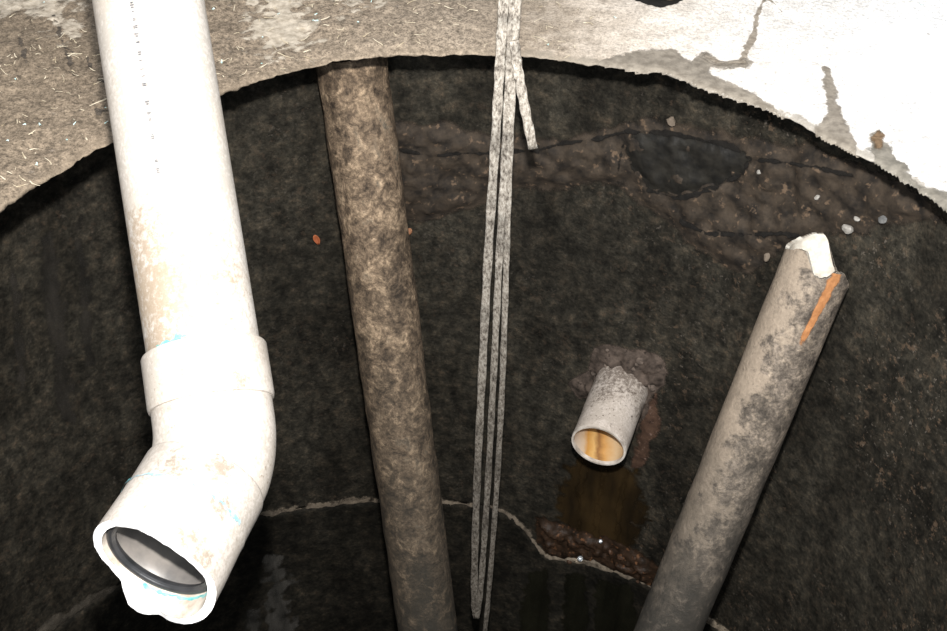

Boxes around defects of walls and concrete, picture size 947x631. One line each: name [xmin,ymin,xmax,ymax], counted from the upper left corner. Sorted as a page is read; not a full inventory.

crack [399,128,853,238]
rust [871,130,885,149]
leakage [815,2,947,212]